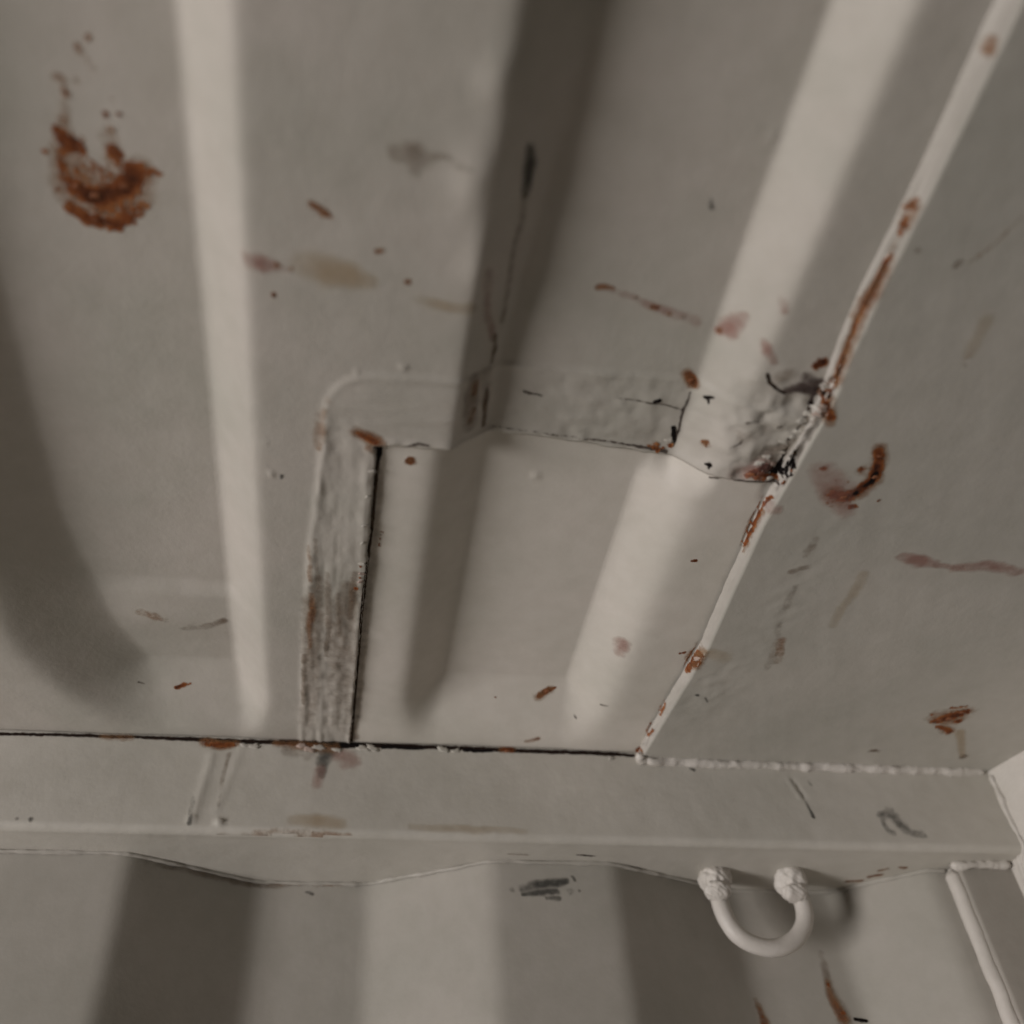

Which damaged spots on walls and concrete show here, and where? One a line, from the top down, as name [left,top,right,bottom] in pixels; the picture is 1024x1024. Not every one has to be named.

rust [41,111,163,233]
rust [897,197,919,237]
peeling [753,358,830,480]
rust [820,381,836,421]
rust [353,430,383,460]
crack [709,477,780,485]
rust [825,445,886,509]
rust [741,495,774,548]
crack [0,455,635,760]
rust [679,648,704,673]
rust [536,687,556,698]
rust [929,706,972,735]